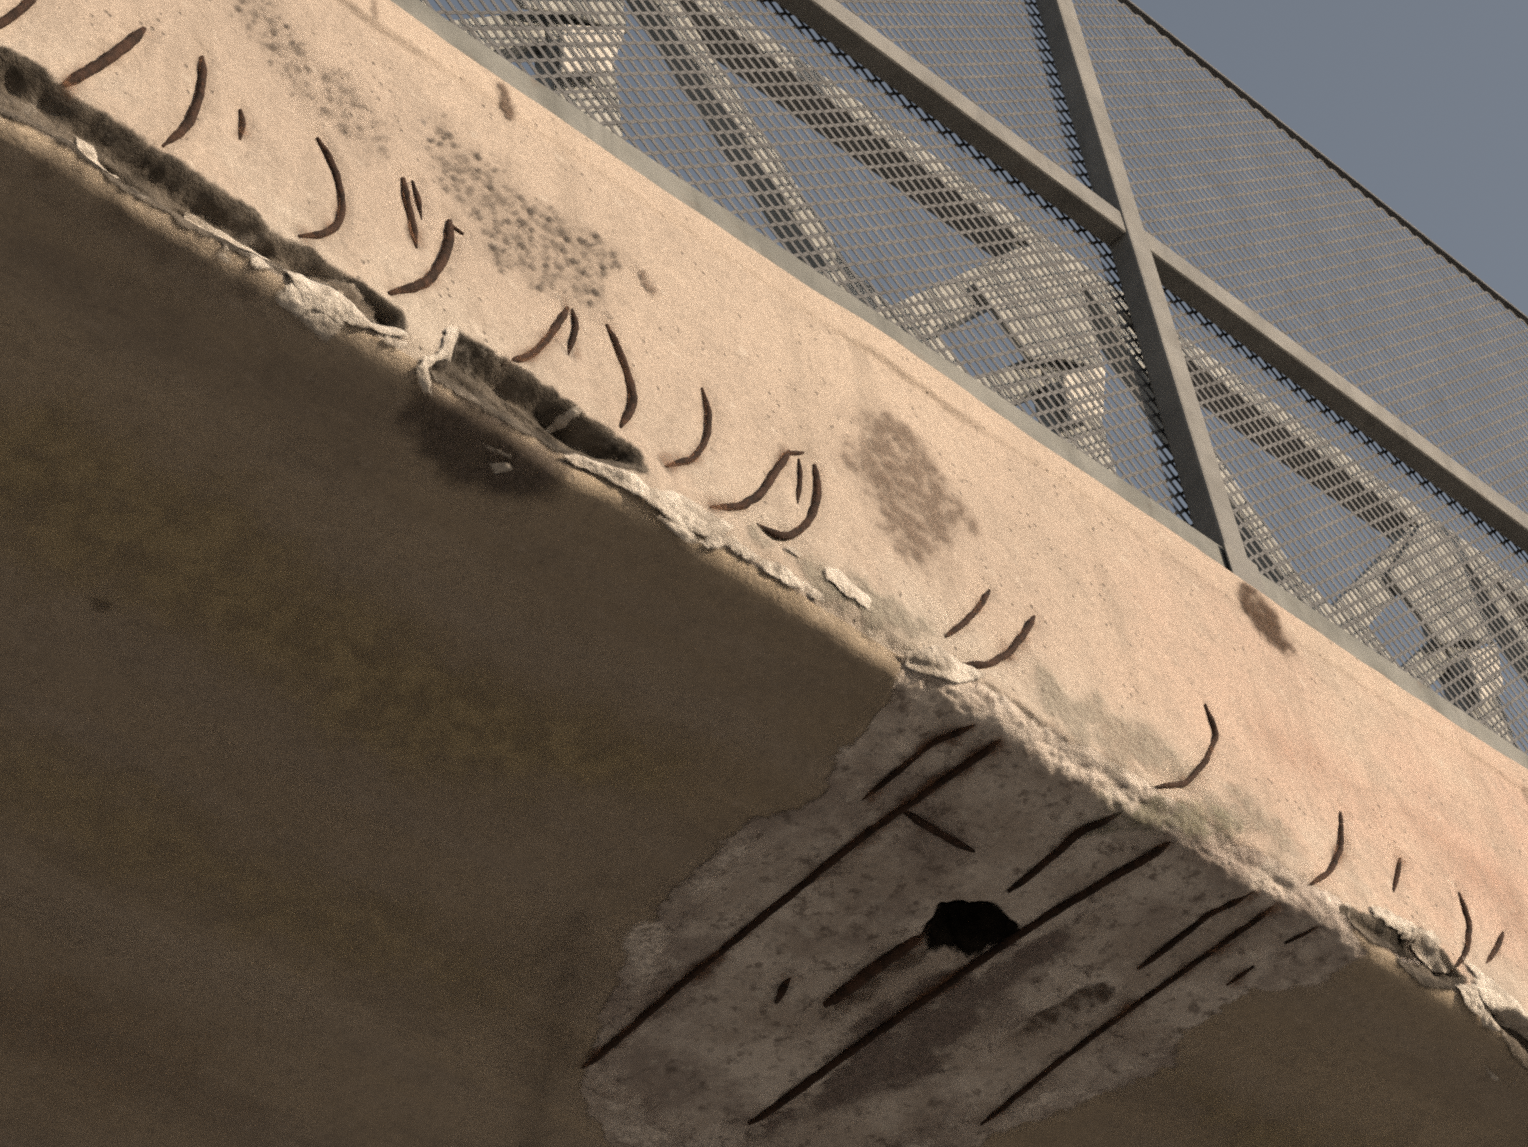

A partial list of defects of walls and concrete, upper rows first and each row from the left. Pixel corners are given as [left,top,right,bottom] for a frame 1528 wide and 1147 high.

spalling [0,0,464,349]
corrosion [498,82,514,119]
spalling [416,306,872,610]
damp [845,412,976,560]
spalling [578,589,1528,1147]